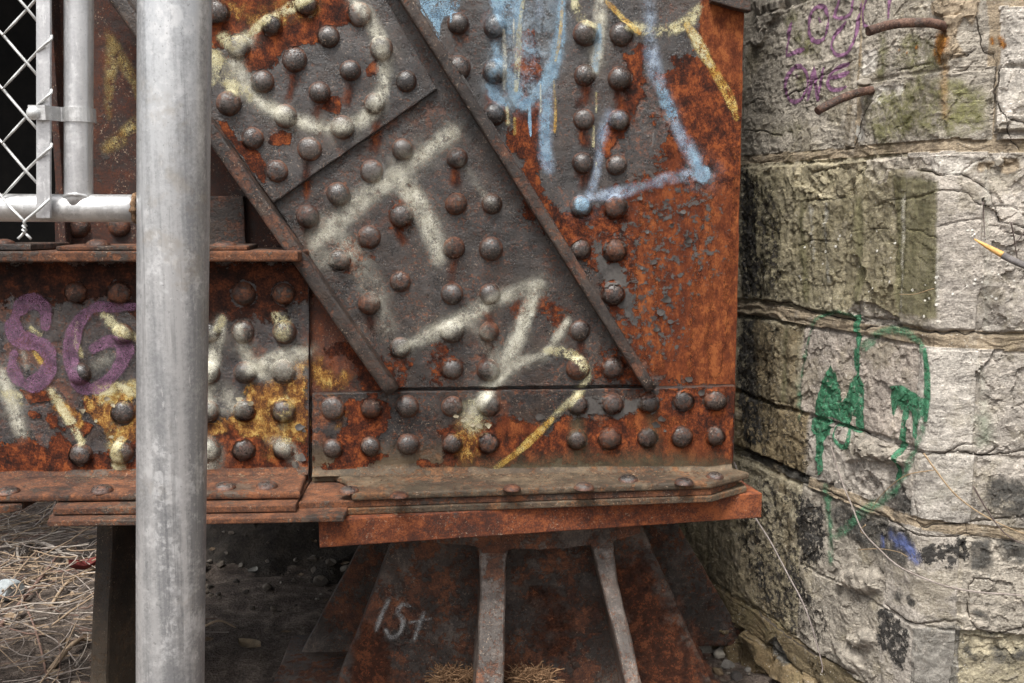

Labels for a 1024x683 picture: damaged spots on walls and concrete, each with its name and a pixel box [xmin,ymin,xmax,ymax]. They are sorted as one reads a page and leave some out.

corrosion [416,0,744,468]
peeling [585,153,731,368]
corrosion [0,385,136,472]
water stain [736,164,1024,642]
corrosion [349,620,390,683]
corrosion [616,556,719,683]
water stain [992,645,1024,661]